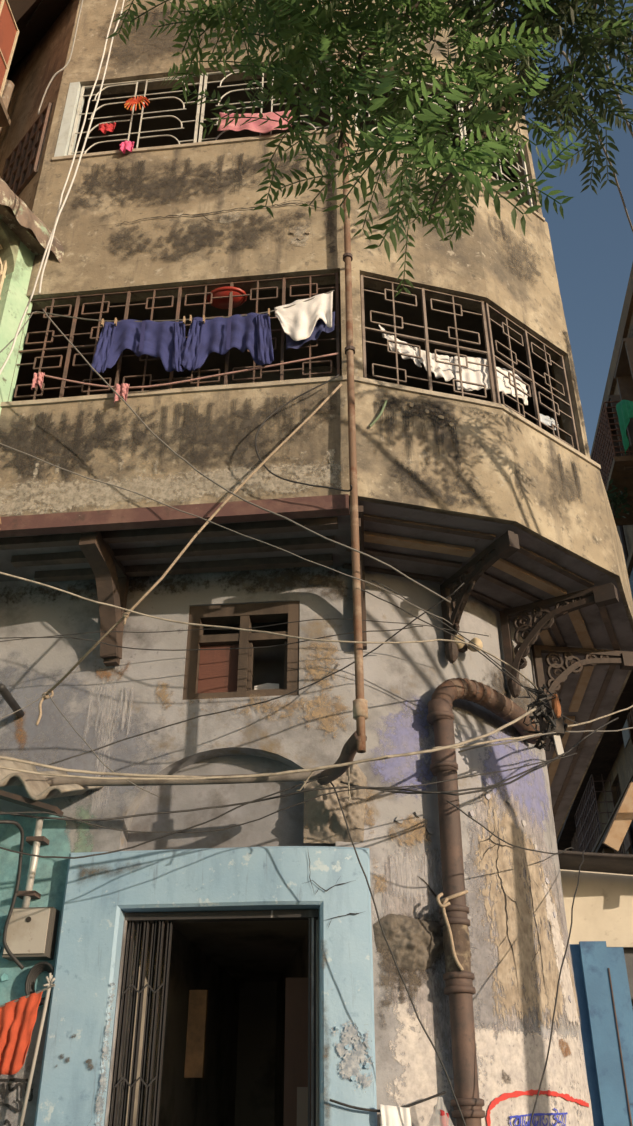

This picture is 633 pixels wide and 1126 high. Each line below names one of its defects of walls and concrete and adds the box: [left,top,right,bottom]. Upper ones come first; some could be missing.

water stain [73,152,336,260]
water stain [564,331,589,452]
water stain [0,396,344,516]
water stain [374,393,487,507]
water stain [550,455,582,501]
peeling [390,811,435,846]
crack [306,853,365,927]
crack [480,793,568,1008]
peeling [332,1021,373,1092]